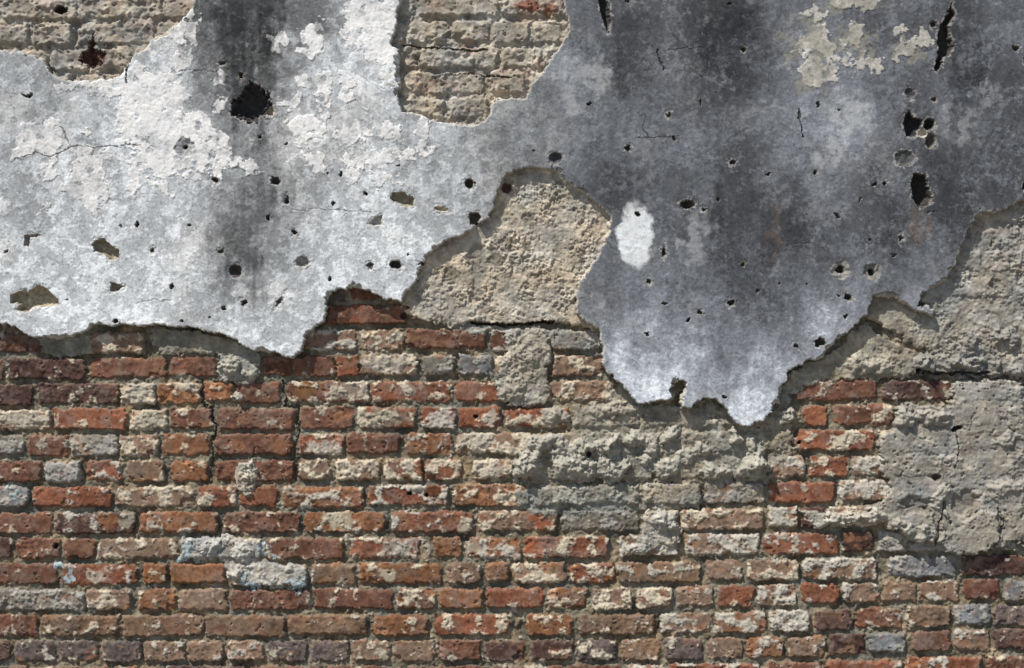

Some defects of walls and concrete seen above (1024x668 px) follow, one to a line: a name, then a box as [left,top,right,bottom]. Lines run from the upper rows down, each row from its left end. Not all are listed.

peeling [791,0,957,89]
crack [21,126,142,158]
spalling [0,0,265,218]
spalling [266,0,568,207]
peeling [915,128,936,149]
spalling [401,152,610,332]
efflorescence [615,200,654,268]
peeling [10,284,59,313]
peeling [110,281,125,293]